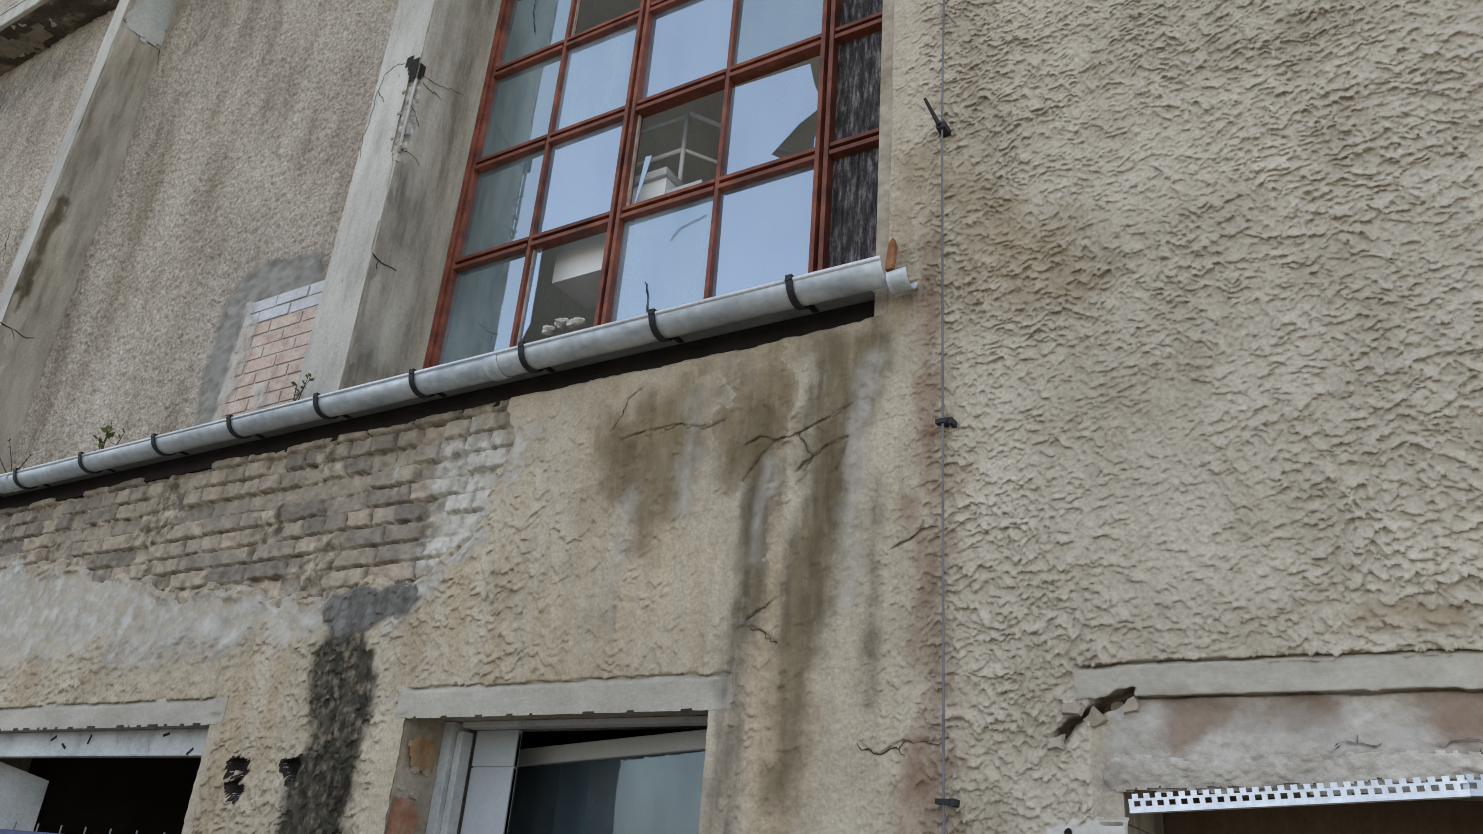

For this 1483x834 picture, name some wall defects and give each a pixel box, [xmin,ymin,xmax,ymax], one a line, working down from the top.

peeling [0,23,53,59]
crack [360,63,464,165]
leakage [0,559,322,666]
flaking render [0,396,517,608]
leakage [385,429,527,627]
leakage [596,368,792,551]
crack [615,388,850,481]
leakage [771,330,885,792]
flaking render [223,747,255,804]
flaking render [279,750,305,790]
leakage [278,633,376,834]
flaking render [1047,687,1141,751]